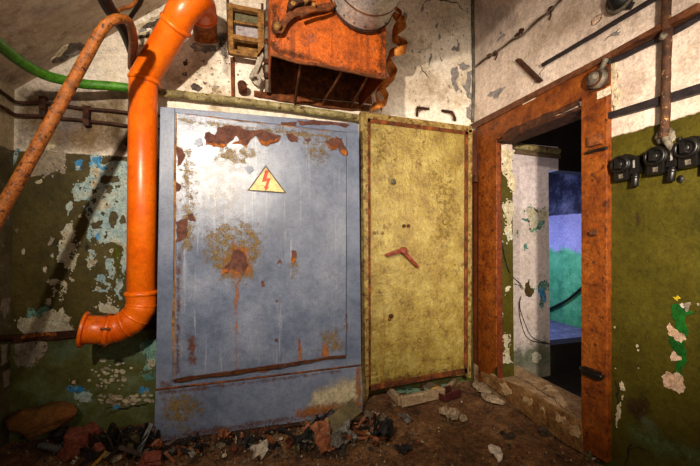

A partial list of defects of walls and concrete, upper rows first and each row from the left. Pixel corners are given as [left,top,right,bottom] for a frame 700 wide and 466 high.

flaking render [443,62,472,120]
peeling [501,147,550,244]
peeling [0,148,127,388]
peeling [523,279,550,310]
peeling [67,336,157,409]
peeling [503,332,524,373]
peeling [614,380,625,430]
peeling [661,296,700,394]